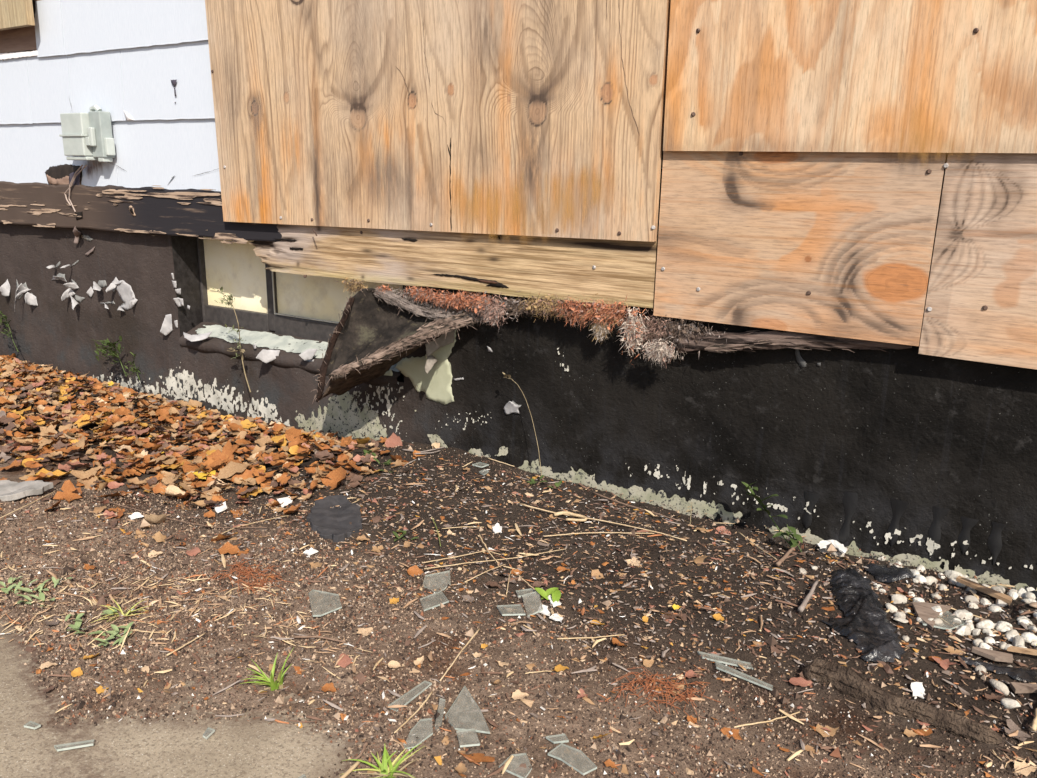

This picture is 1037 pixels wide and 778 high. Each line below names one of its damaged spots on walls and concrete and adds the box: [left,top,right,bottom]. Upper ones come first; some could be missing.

peeling [0,185,222,312]
peeling [92,273,491,448]
peeling [503,401,521,415]
peeling [518,459,831,545]
peeling [844,521,1037,591]